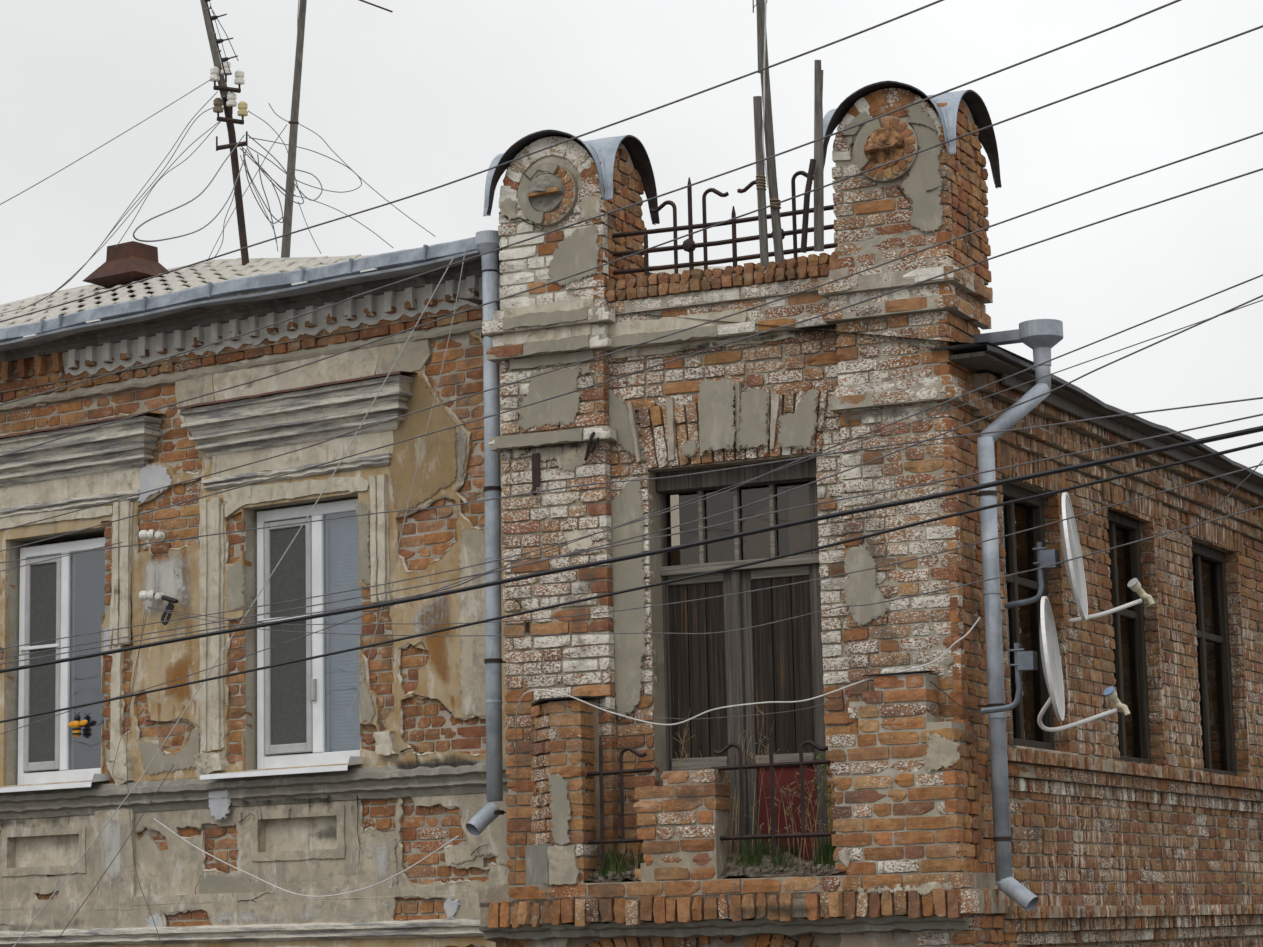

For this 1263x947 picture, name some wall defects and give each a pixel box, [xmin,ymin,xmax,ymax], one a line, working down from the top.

spalling [0,384,202,563]
spalling [224,512,252,567]
spalling [395,335,485,572]
spalling [103,615,195,754]
spalling [225,618,252,766]
spalling [361,586,486,756]
spalling [145,909,212,927]
spalling [135,823,238,873]
spalling [358,798,496,921]